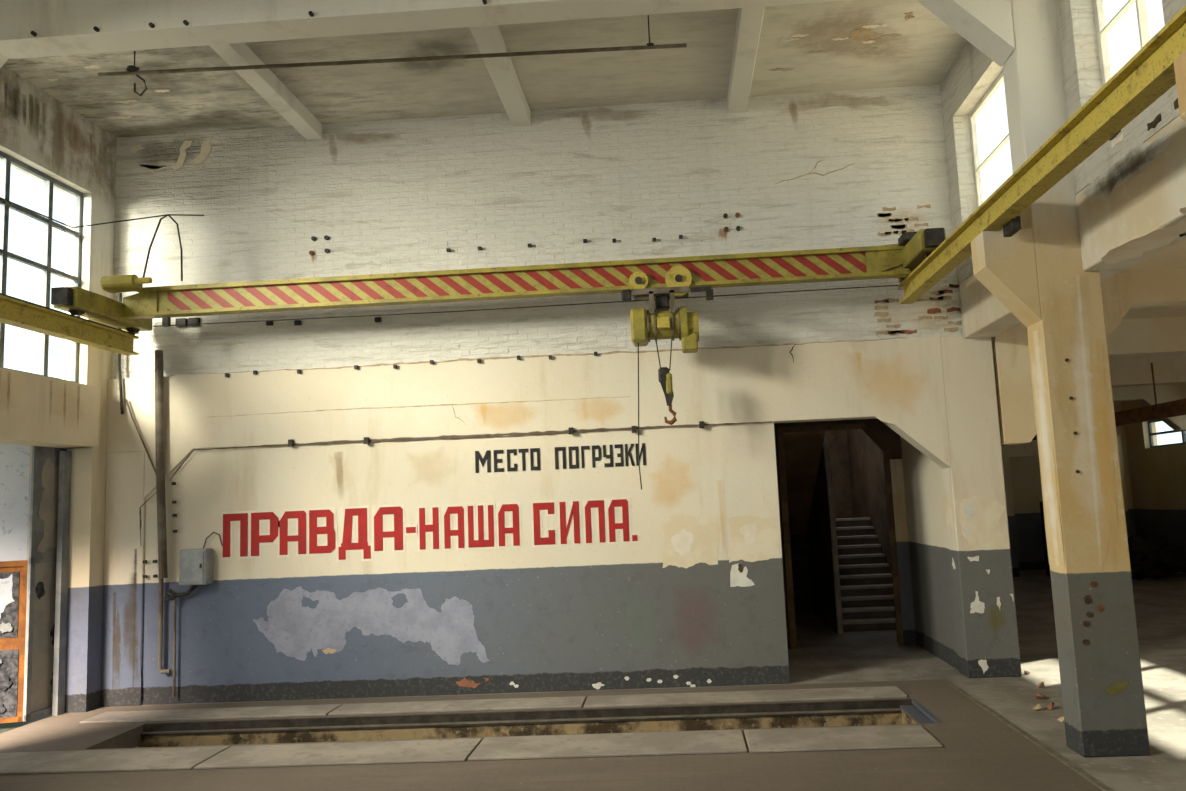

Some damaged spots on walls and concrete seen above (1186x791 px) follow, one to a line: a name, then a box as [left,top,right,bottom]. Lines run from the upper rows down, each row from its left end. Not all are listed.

damp [1,47,287,166]
spalling [869,280,964,337]
peeling [661,514,779,587]
peeling [253,586,490,688]
peeling [970,591,1014,613]
spalling [82,699,945,750]